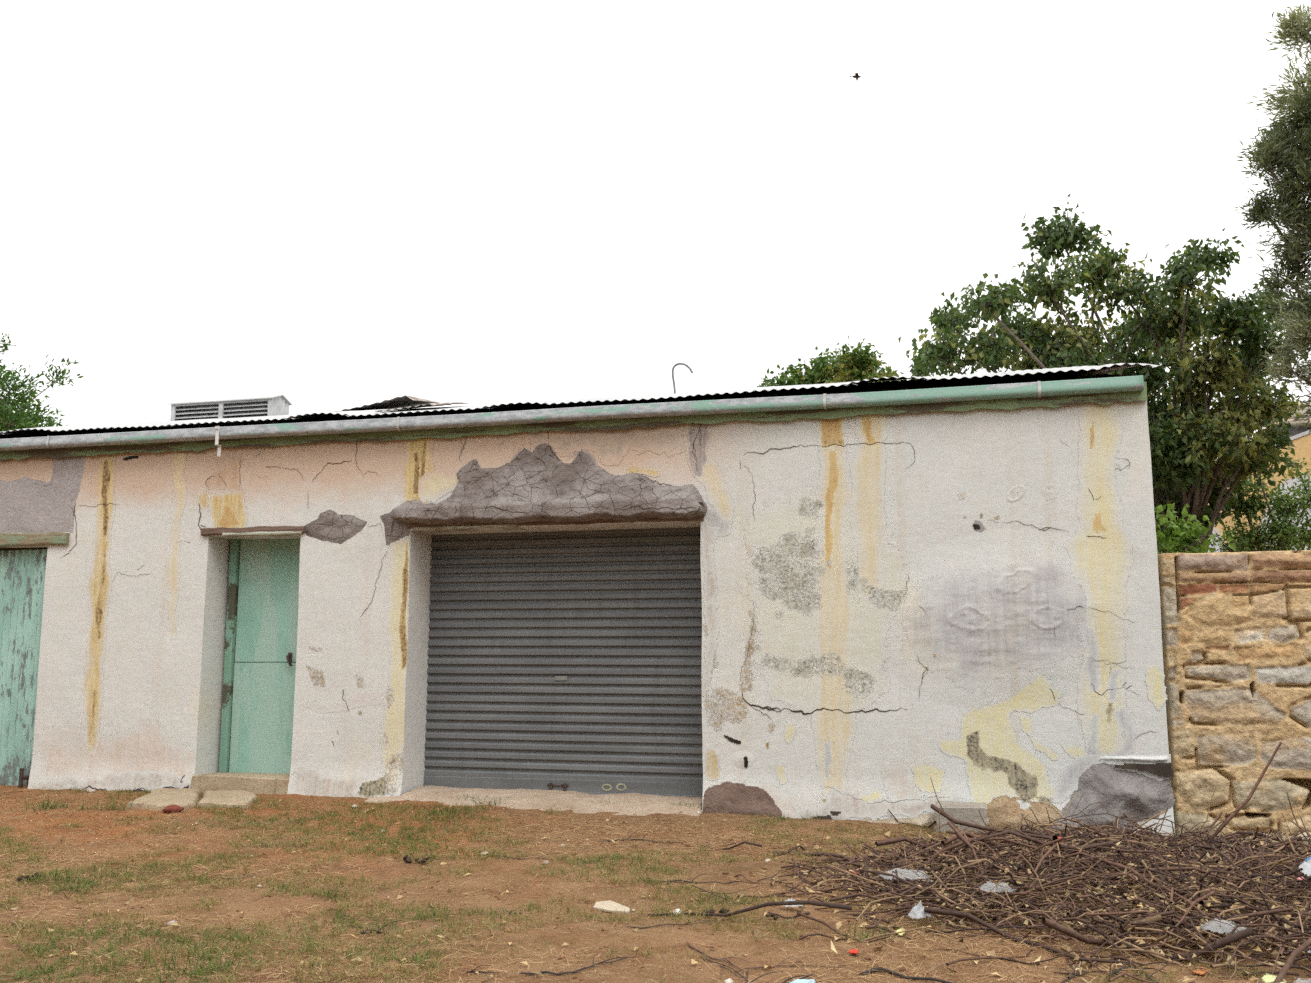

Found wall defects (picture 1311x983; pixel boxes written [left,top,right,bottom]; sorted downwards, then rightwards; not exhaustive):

water stain [702,401,1136,804]
crack [740,604,928,719]
peeling [912,675,1086,830]
spalling [813,811,841,820]
spalling [860,813,934,826]